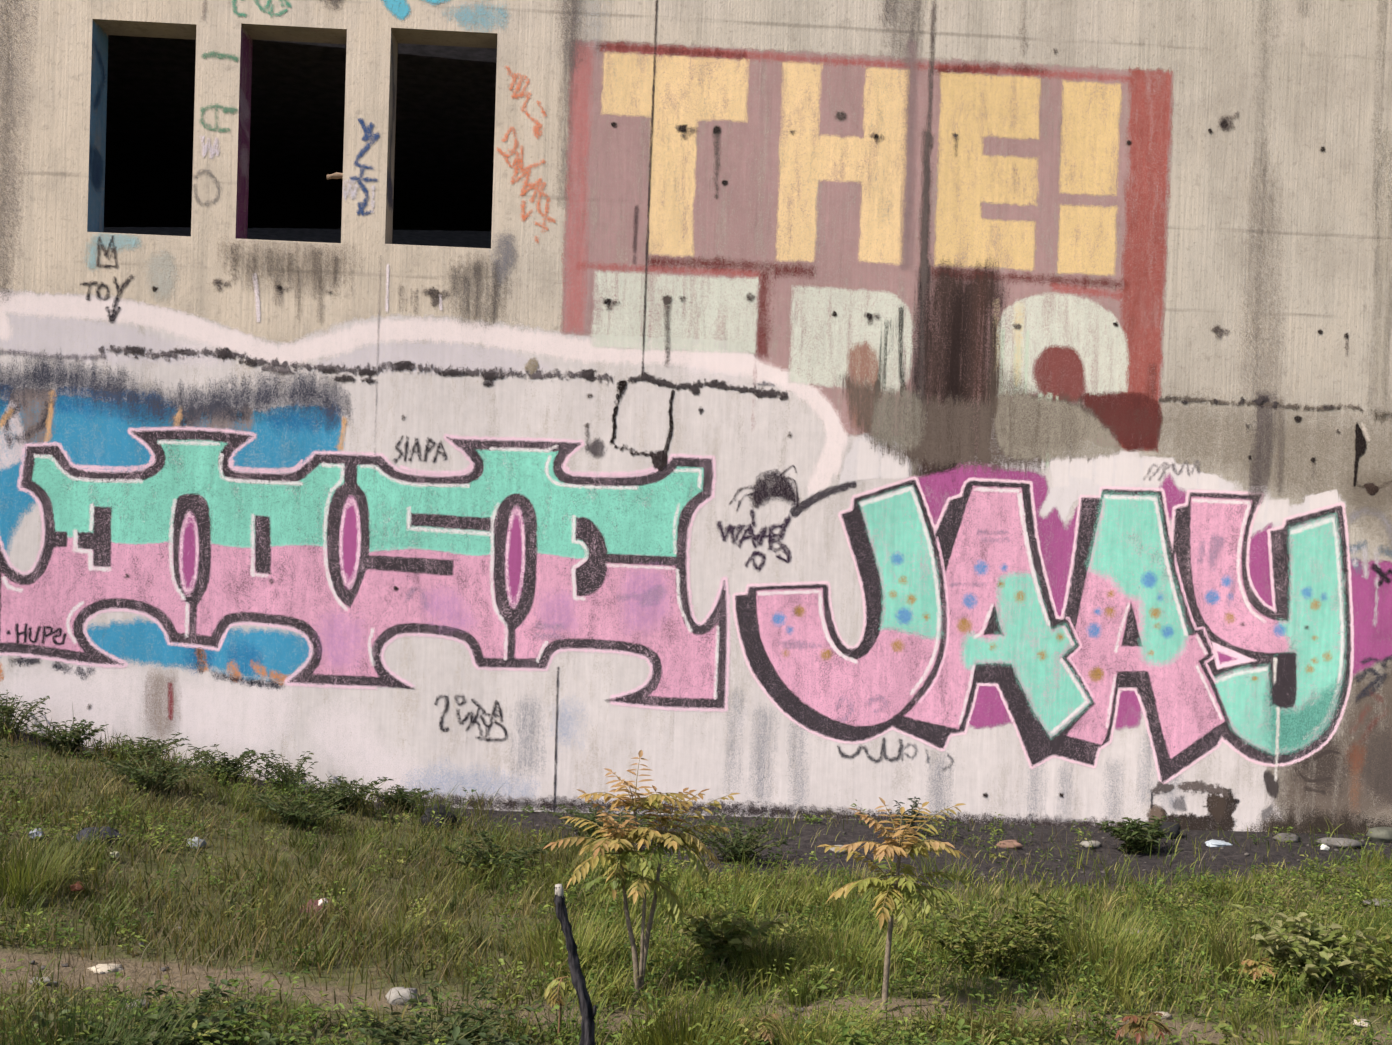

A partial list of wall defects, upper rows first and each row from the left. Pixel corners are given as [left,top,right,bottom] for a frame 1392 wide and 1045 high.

leakage [874,0,932,70]
leakage [0,0,41,306]
leakage [217,233,367,325]
leakage [443,228,519,330]
leakage [832,257,1161,497]
peeling [1146,780,1238,831]